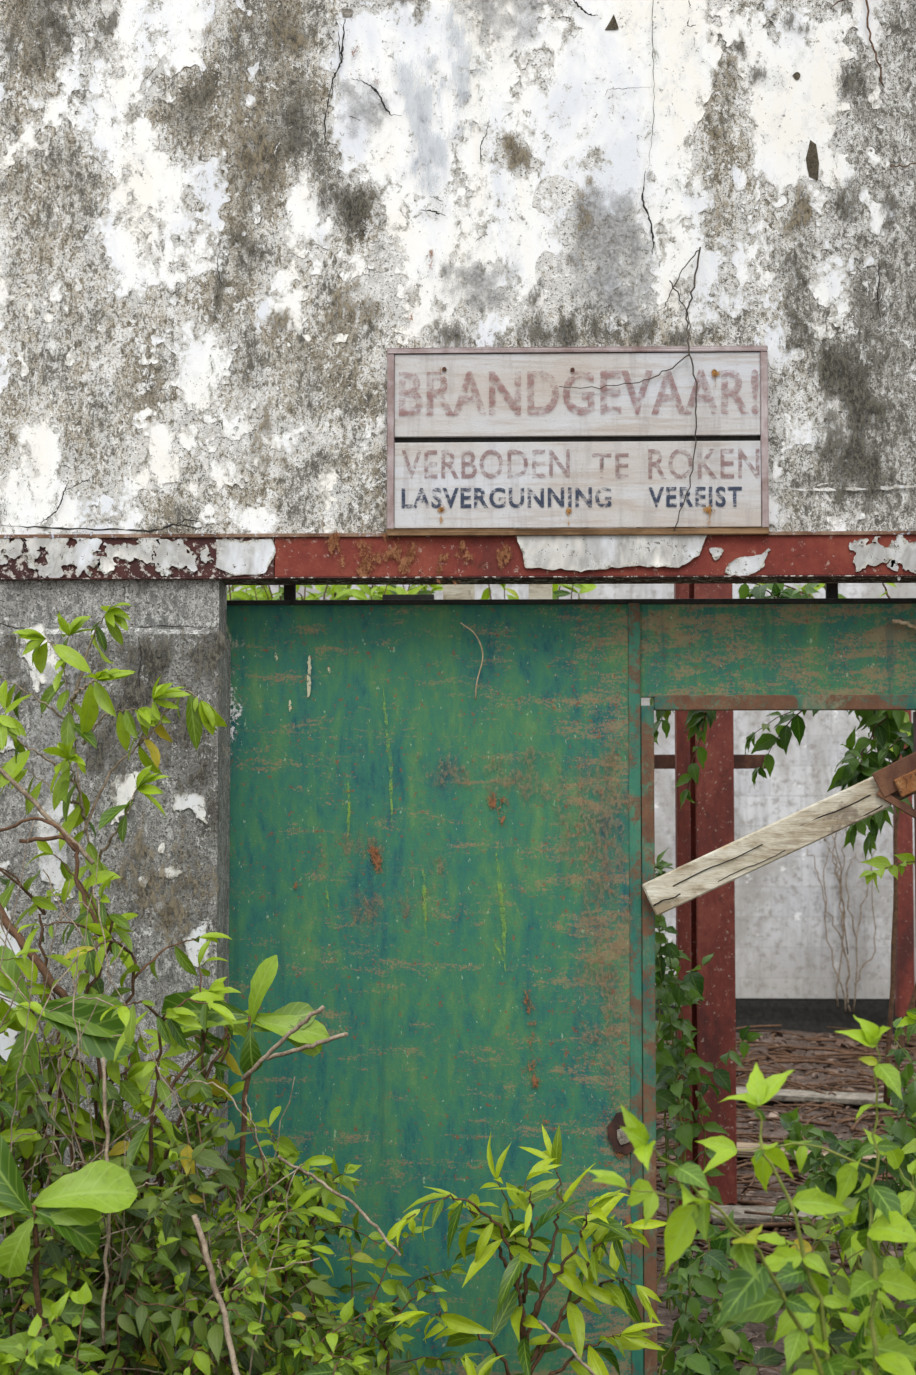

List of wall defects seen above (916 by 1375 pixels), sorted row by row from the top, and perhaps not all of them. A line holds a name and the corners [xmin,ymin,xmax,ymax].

leakage [0,0,118,86]
leakage [198,0,387,248]
peeling [244,0,895,381]
peeling [0,0,353,580]
leakage [210,258,228,320]
leakage [270,307,290,335]
rust [324,530,427,580]
spalling [517,527,770,578]
peeling [826,512,916,581]
rust [488,792,509,826]
rust [368,846,382,874]
rust [524,990,540,1093]